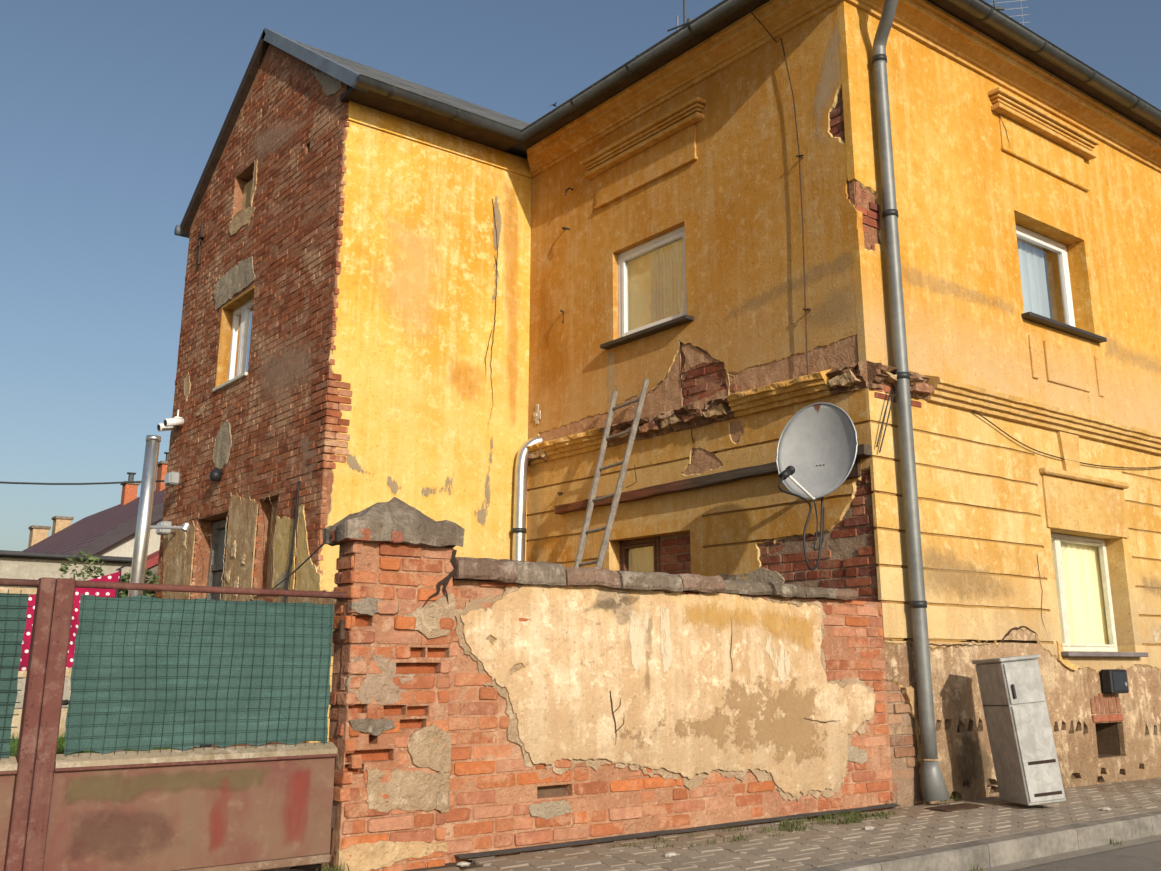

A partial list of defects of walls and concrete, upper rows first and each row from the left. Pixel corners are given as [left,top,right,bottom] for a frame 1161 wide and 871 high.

spalling [828,83,845,143]
spalling [847,178,883,251]
crack [485,199,499,417]
spalling [528,334,897,460]
peeling [679,447,723,476]
spalling [756,465,886,603]
peeling [226,540,246,597]
crack [422,549,457,608]
spalling [396,647,446,674]
spalling [383,704,427,729]
spalling [883,628,1161,808]